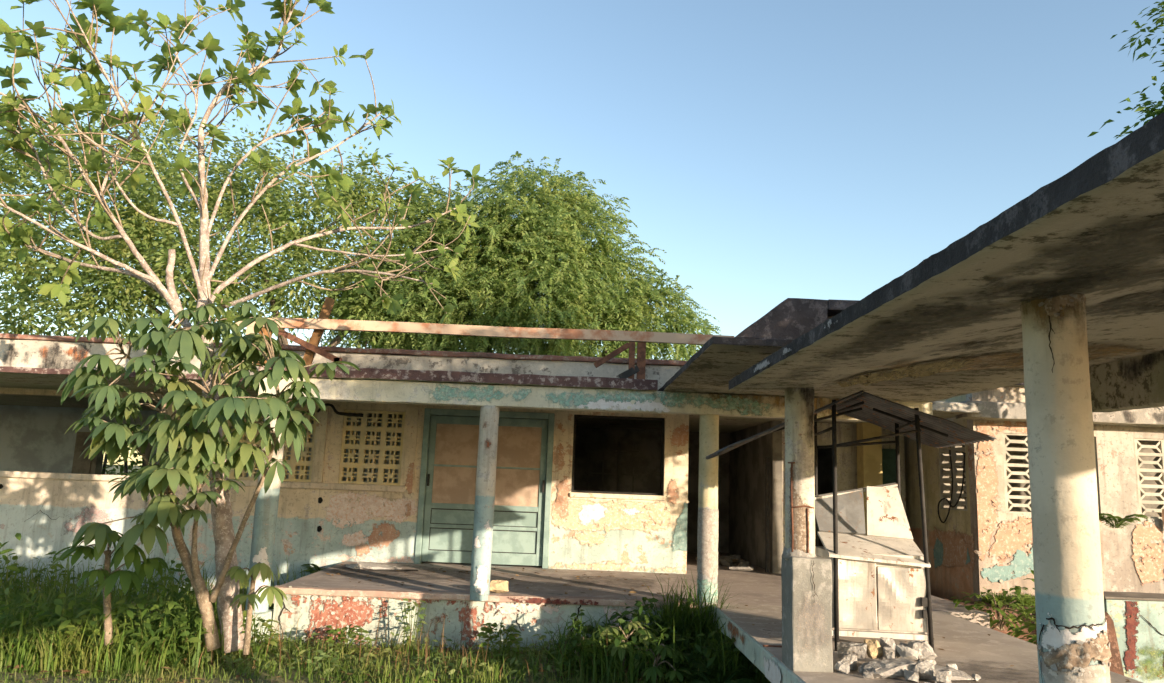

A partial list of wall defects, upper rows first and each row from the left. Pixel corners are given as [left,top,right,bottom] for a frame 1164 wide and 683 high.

leakage [712,220,1164,446]
crack [1047,315,1055,373]
peeling [577,398,670,413]
peeling [316,463,418,563]
peeling [549,423,719,580]
peeling [965,422,1033,583]
peeling [1131,518,1164,588]
spalling [1037,601,1141,683]